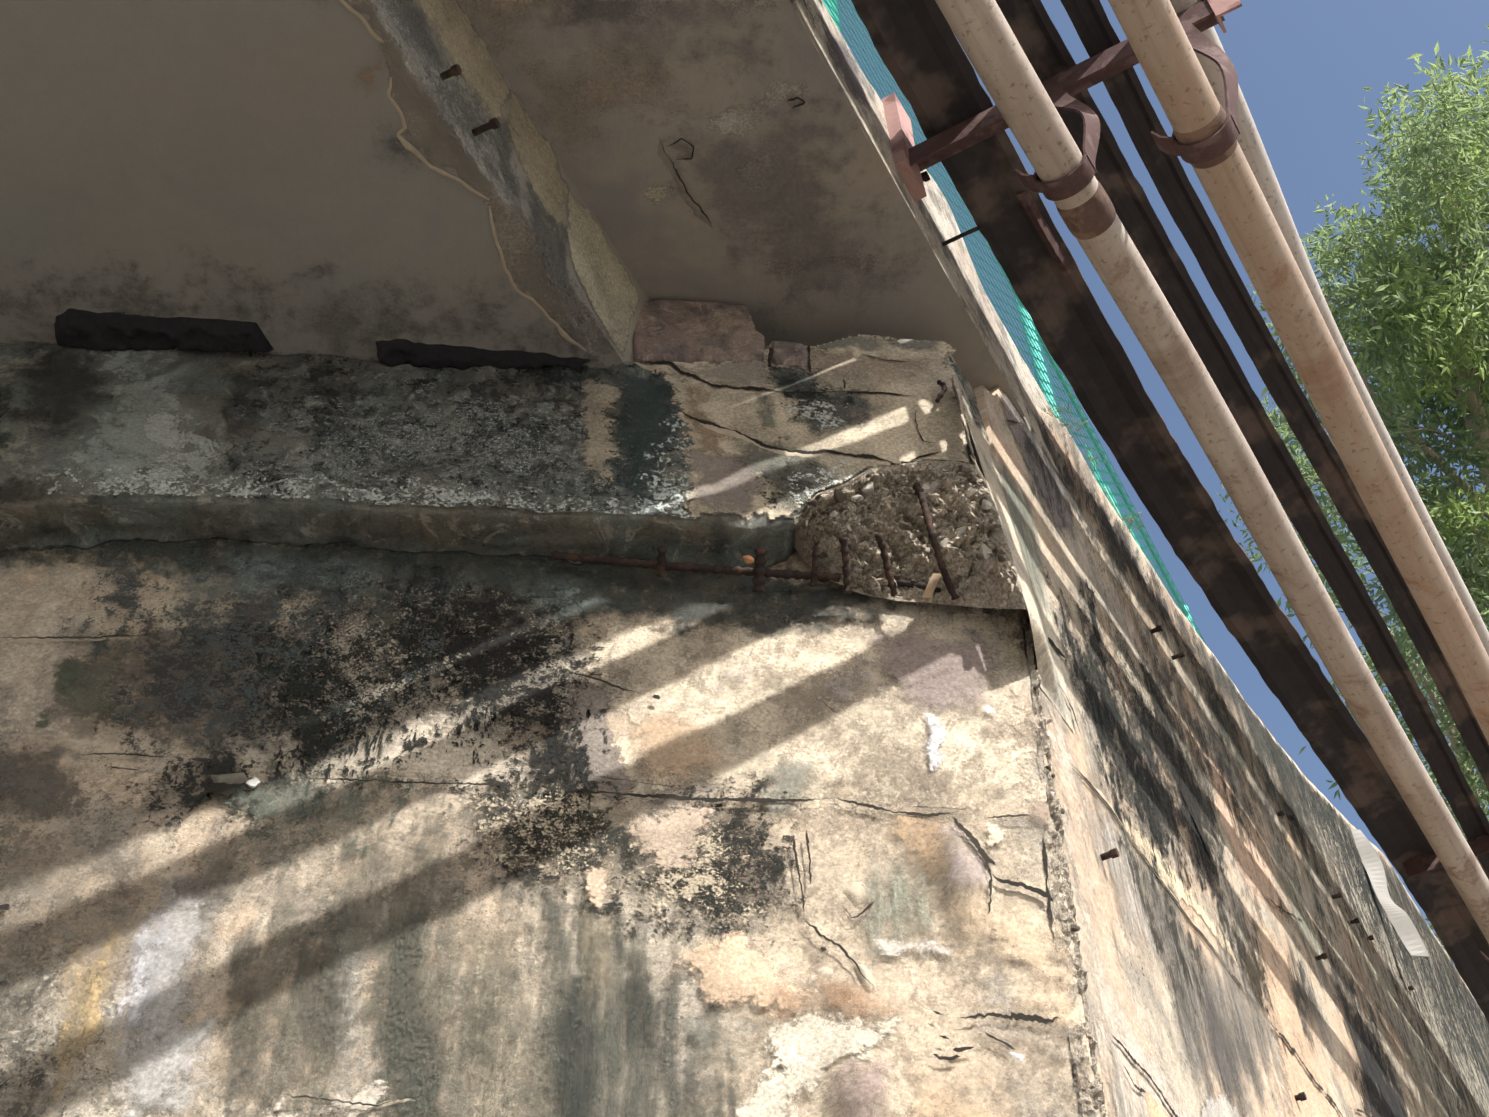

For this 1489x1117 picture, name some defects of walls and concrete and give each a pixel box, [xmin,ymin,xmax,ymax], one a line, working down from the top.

water stain [11,0,970,520]
crack [657,137,713,228]
crack [634,345,989,490]
crack [74,751,168,771]
crack [306,776,1054,992]
water stain [0,413,1489,1117]
spalling [551,377,1108,1117]
crack [1021,617,1408,1117]